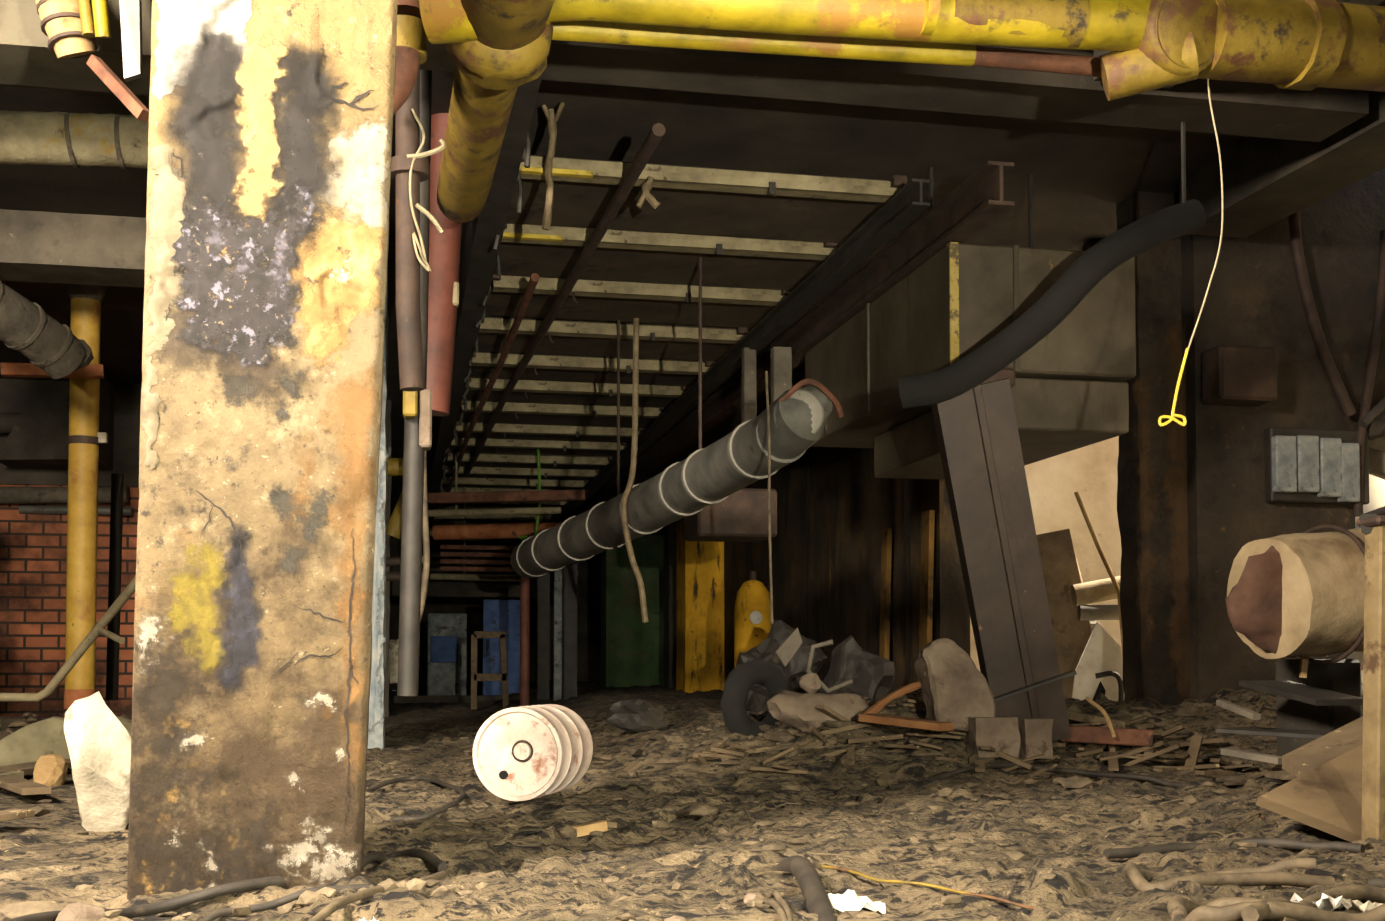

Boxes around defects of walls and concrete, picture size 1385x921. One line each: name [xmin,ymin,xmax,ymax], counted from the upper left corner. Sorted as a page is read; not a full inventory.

water stain [190,32,244,134]
water stain [293,51,337,116]
peeling [151,0,390,381]
water stain [157,308,305,420]
water stain [269,486,334,573]
peeling [368,450,388,730]